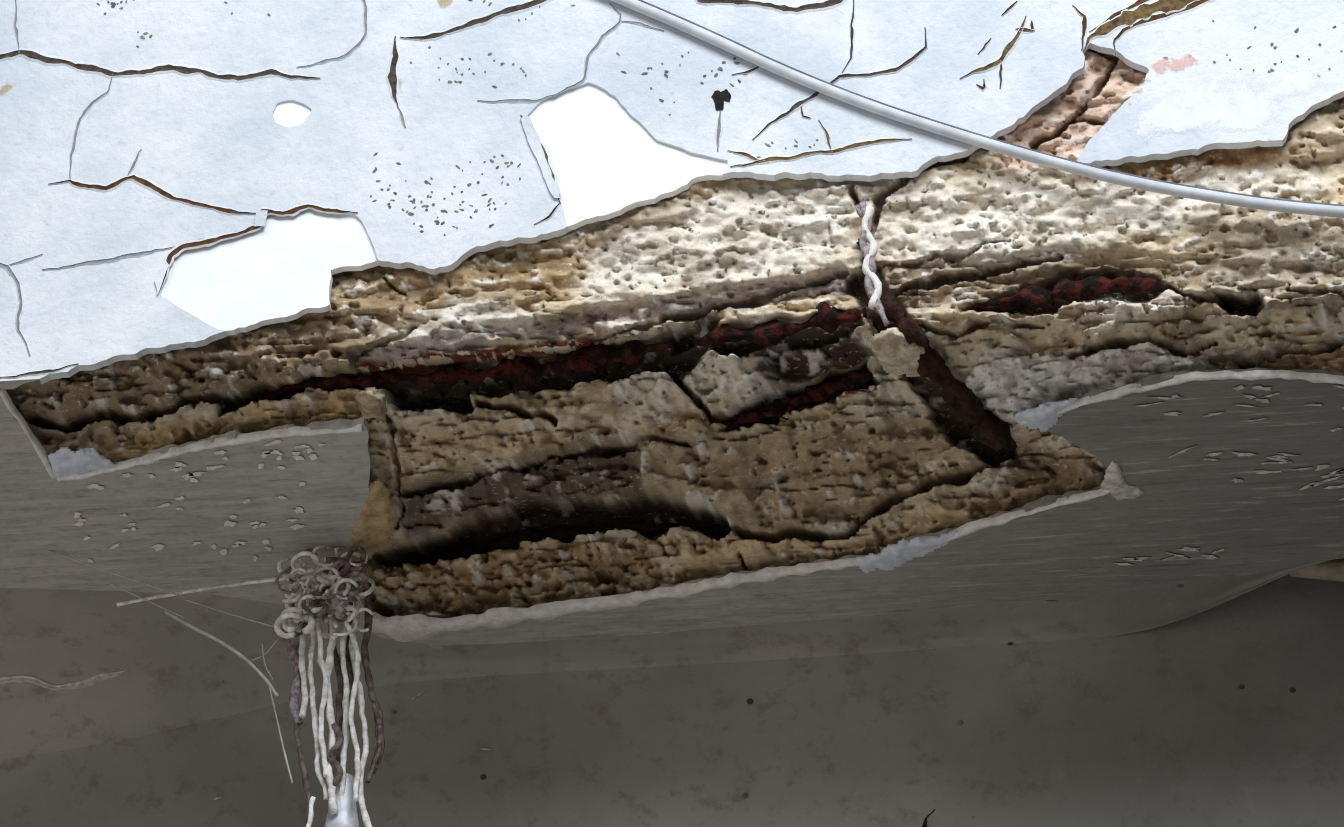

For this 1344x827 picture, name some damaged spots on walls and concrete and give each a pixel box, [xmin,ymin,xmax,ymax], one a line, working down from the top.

crack [477,3,664,225]
crack [694,0,928,167]
crack [960,1,1035,92]
crack [1072,0,1215,56]
crack [0,0,552,379]
rust [976,275,1164,315]
rust [222,338,674,411]
spalling [0,46,1344,642]
rust [406,520,723,564]